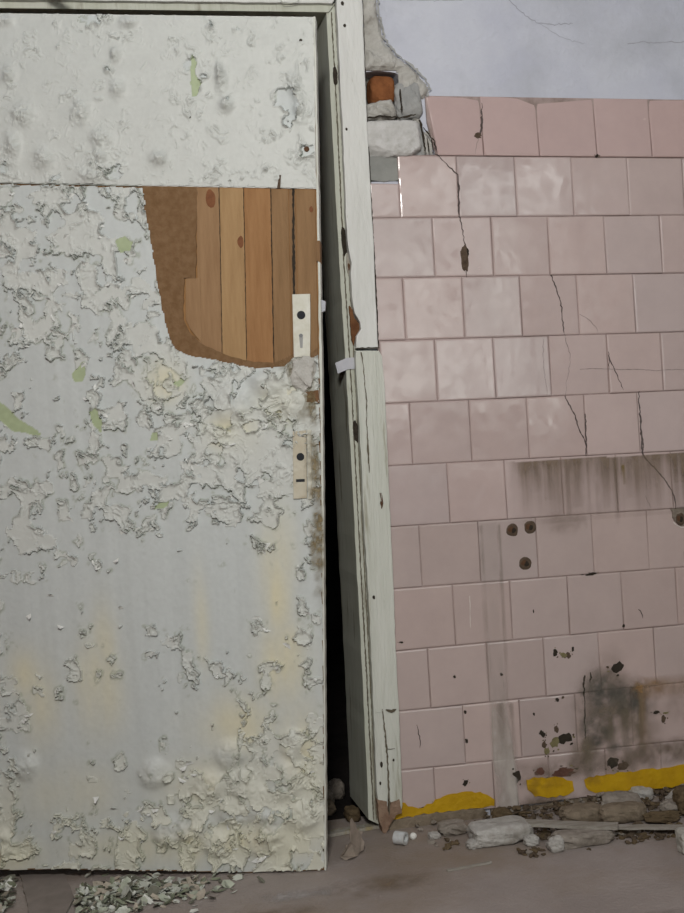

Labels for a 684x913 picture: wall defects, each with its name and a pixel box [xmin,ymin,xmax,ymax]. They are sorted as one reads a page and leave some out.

spalling [363,0,437,182]
crack [474,106,483,154]
crack [432,152,469,277]
crack [543,275,684,509]
leakage [520,457,618,478]
leakage [630,453,684,482]
spalling [671,508,684,528]
leakage [575,677,645,772]